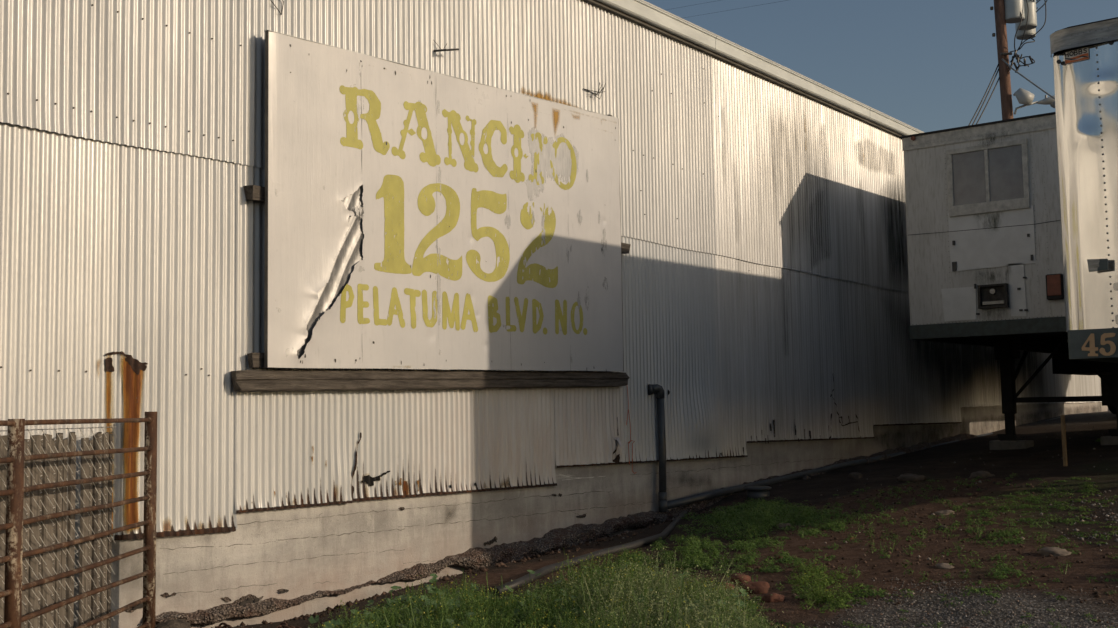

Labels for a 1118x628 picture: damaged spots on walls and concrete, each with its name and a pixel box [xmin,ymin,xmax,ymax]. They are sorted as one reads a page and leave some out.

corrosion [522,89,571,131]
damp [887,190,908,275]
corrosion [98,351,962,540]